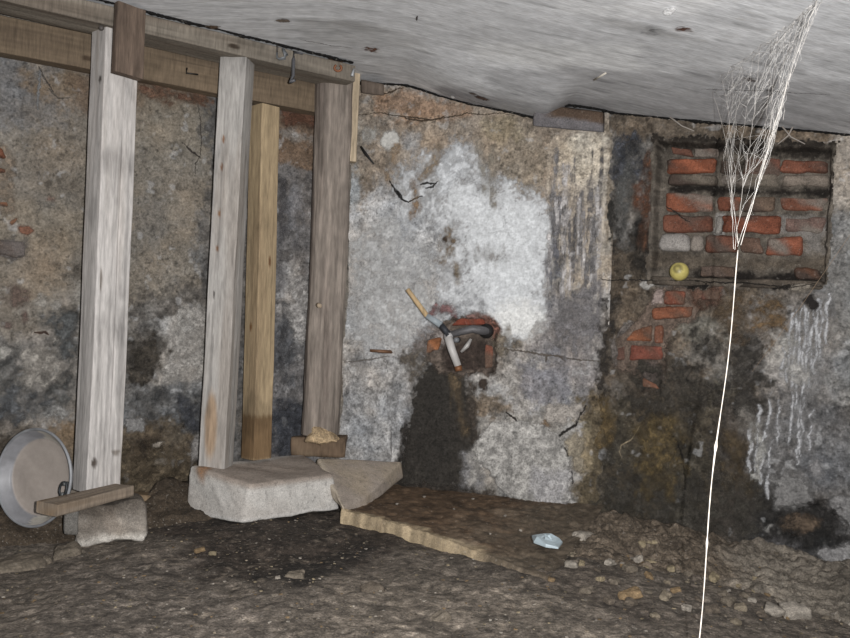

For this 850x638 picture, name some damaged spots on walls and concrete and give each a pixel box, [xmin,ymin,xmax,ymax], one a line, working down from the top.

crack [143,9,534,122]
peeling [362,130,399,150]
crack [389,180,438,203]
peeling [348,142,562,390]
damp [545,130,652,401]
flaking render [610,281,723,392]
damp [398,362,484,491]
crack [558,404,587,484]
damp [592,293,835,540]